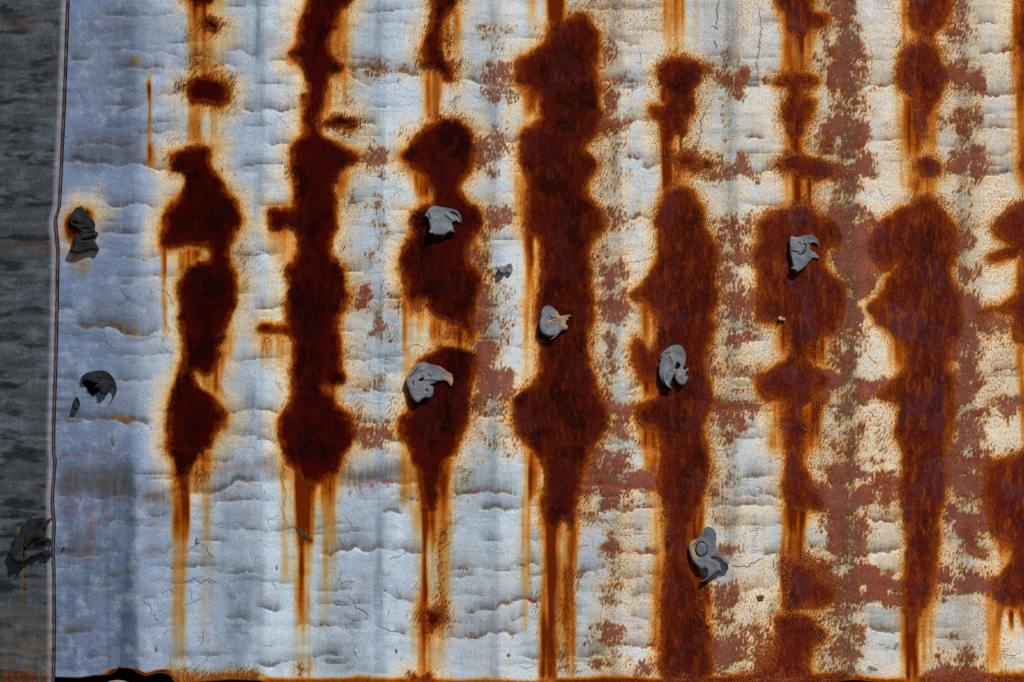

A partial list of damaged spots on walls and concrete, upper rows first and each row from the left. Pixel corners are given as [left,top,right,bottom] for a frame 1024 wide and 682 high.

rust [150,122,261,542]
rust [257,0,1024,682]